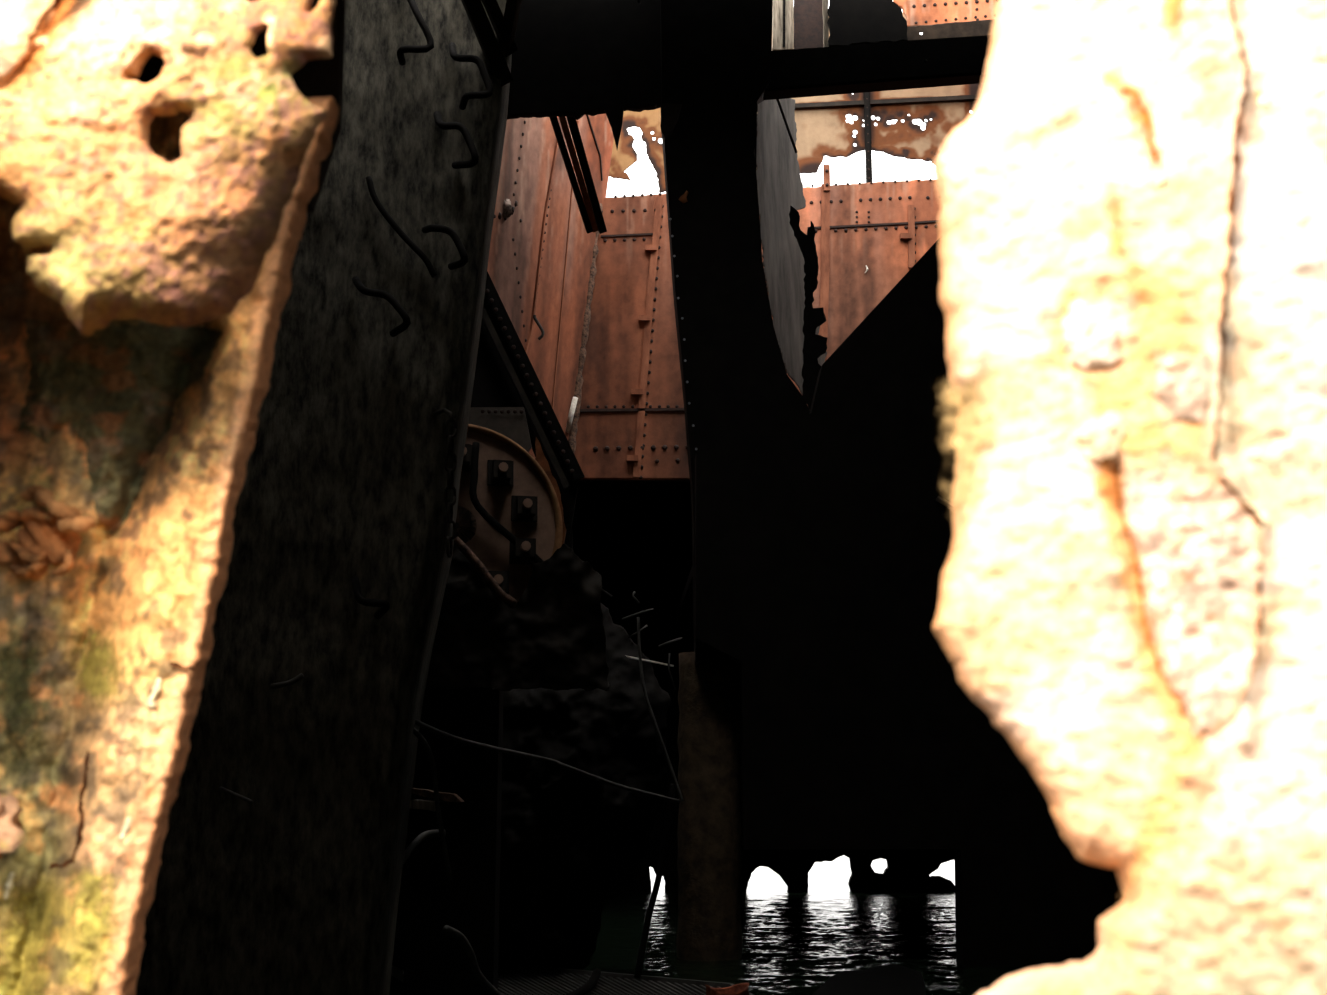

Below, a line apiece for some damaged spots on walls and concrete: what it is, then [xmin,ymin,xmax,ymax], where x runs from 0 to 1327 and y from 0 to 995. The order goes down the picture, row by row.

rust [0,0,336,337]
rust [1104,74,1156,160]
peeling [789,206,827,410]
peeling [1063,300,1120,369]
crack [1198,0,1263,661]
peeling [0,485,75,579]
rust [1082,198,1202,885]